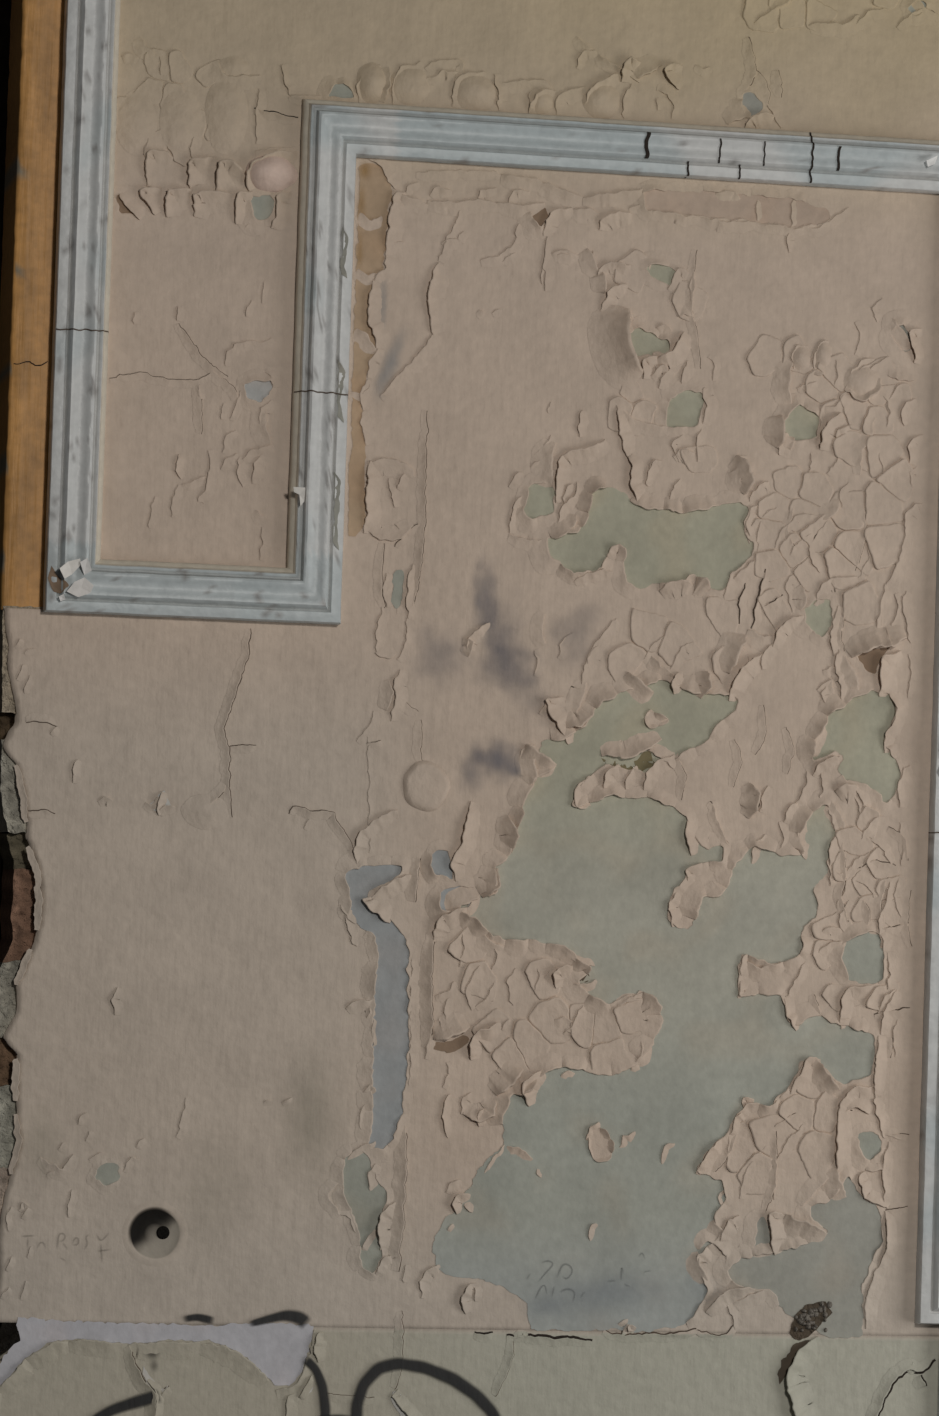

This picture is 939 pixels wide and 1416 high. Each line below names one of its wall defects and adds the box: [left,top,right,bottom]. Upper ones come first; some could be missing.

crack [109,324,241,434]
peeling [48,558,94,602]
peeling [318,158,926,1416]
spalling [0,606,43,1219]
peeling [0,1317,327,1416]